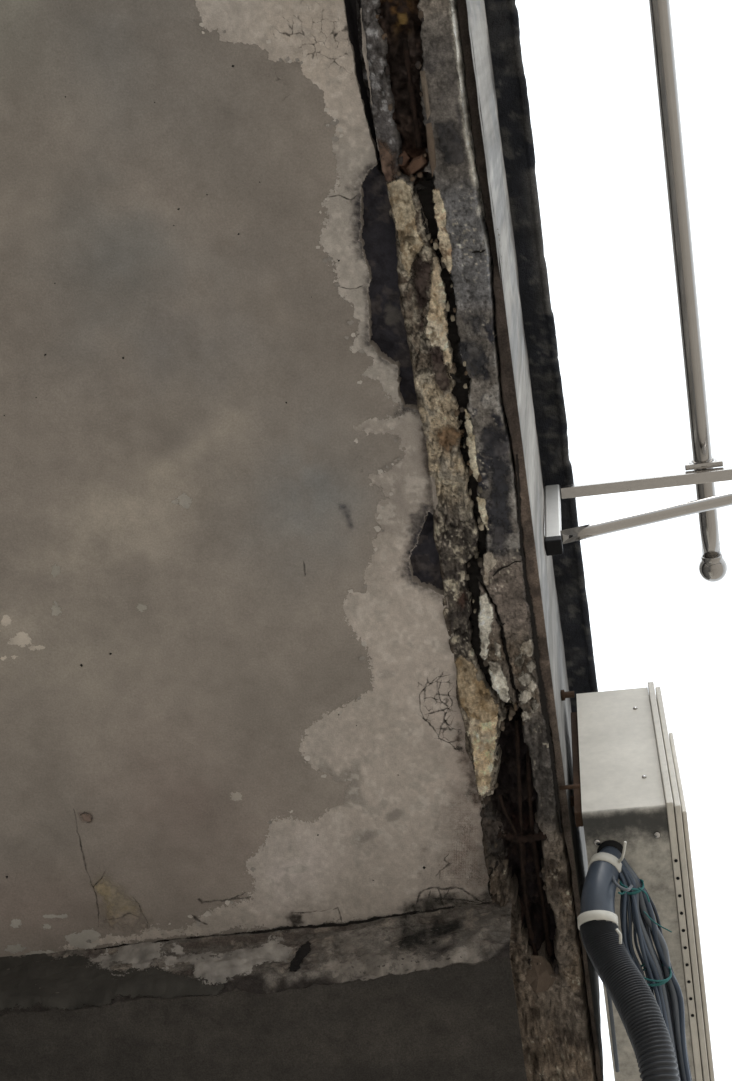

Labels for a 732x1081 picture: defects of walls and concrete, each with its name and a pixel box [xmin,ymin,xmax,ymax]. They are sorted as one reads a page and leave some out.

peeling [0,0,559,986]
crack [413,180,562,833]
crack [74,811,498,950]